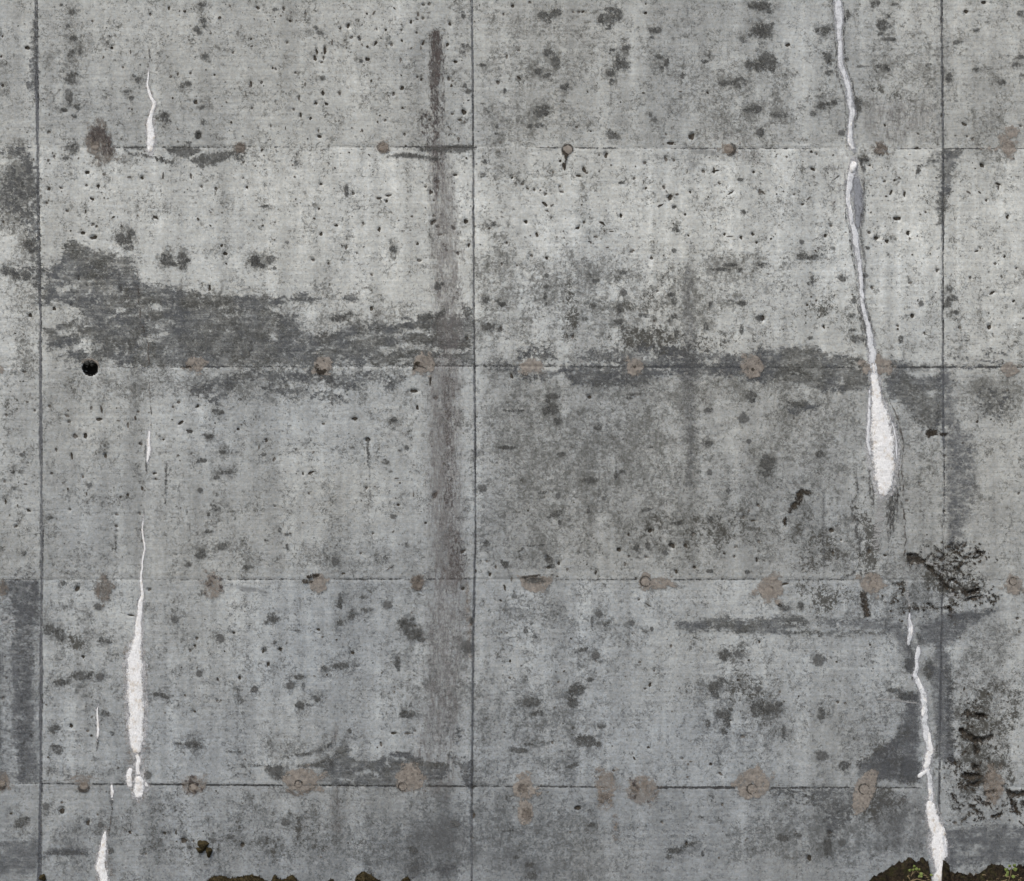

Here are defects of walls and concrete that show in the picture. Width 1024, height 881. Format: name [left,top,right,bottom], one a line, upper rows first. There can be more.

water stain [0,0,1010,551]
water stain [676,590,1024,881]